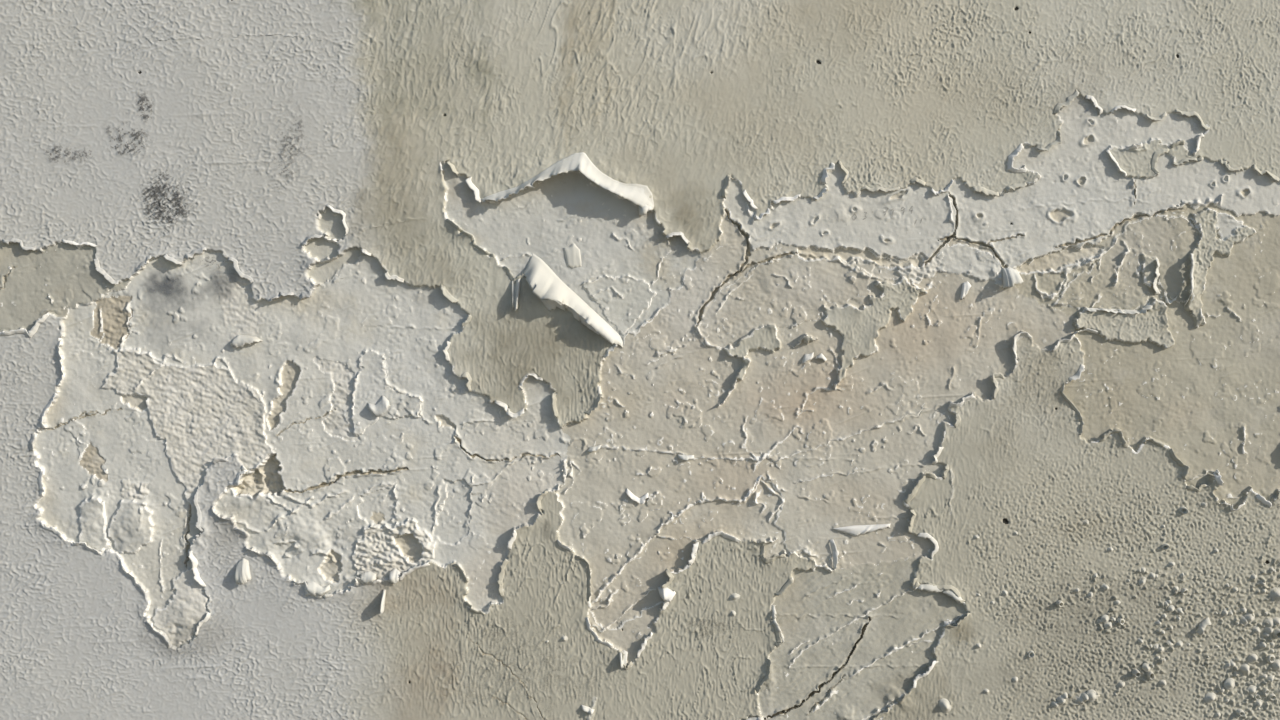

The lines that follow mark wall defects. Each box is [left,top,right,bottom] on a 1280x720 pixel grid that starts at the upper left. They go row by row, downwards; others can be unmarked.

water stain [114,97,151,154]
mould [143,174,187,223]
crack [696,210,799,328]
peeling [0,204,571,651]
peeling [440,90,1280,720]